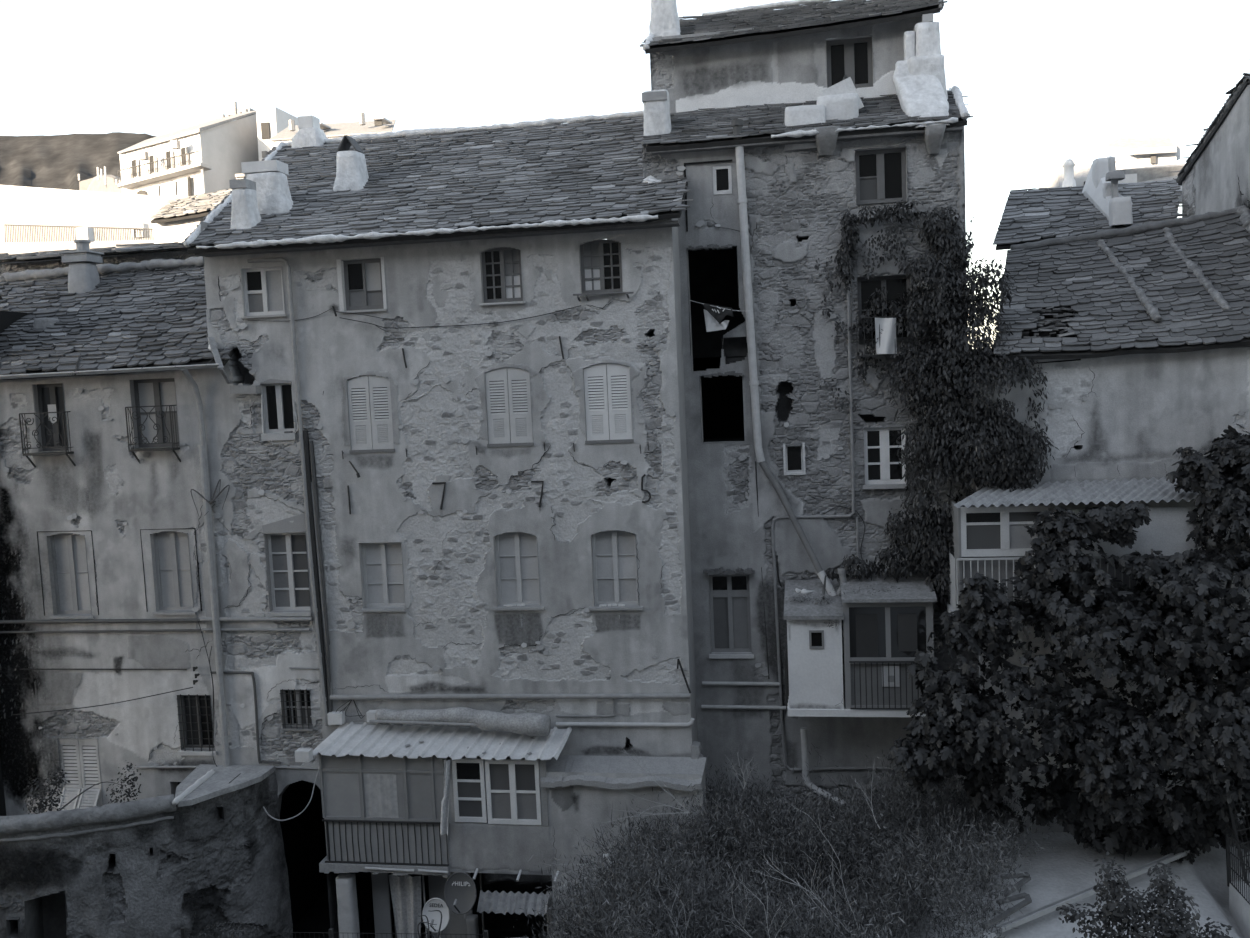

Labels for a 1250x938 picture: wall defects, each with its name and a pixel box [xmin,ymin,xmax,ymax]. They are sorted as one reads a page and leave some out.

flaking render [291,267,338,293]
spalling [217,273,267,426]
flaking render [758,373,788,386]
flaking render [812,310,838,379]
flaking render [377,245,672,675]
flaking render [816,427,843,461]
flaking render [657,412,683,617]
flaking render [188,490,305,638]
flaking render [225,521,364,671]
flaking render [491,608,690,685]
flaking render [214,697,282,752]
flaking render [297,679,322,720]